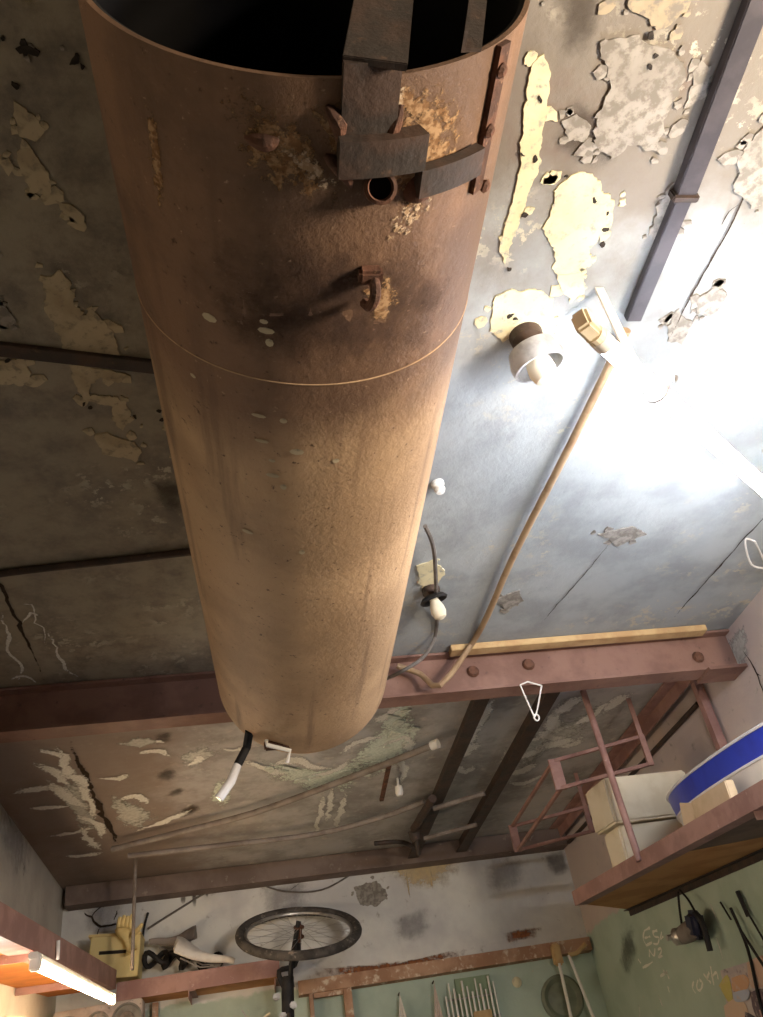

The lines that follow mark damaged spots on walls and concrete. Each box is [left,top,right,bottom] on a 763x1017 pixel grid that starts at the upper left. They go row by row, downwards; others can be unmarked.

peeling [0,81,87,232]
peeling [474,0,713,343]
peeling [717,112,763,213]
peeling [35,262,128,355]
peeling [0,358,48,387]
peeling [69,365,147,465]
peeling [591,526,647,547]
crack [0,583,41,672]
crack [70,747,117,842]
peeling [351,876,390,907]